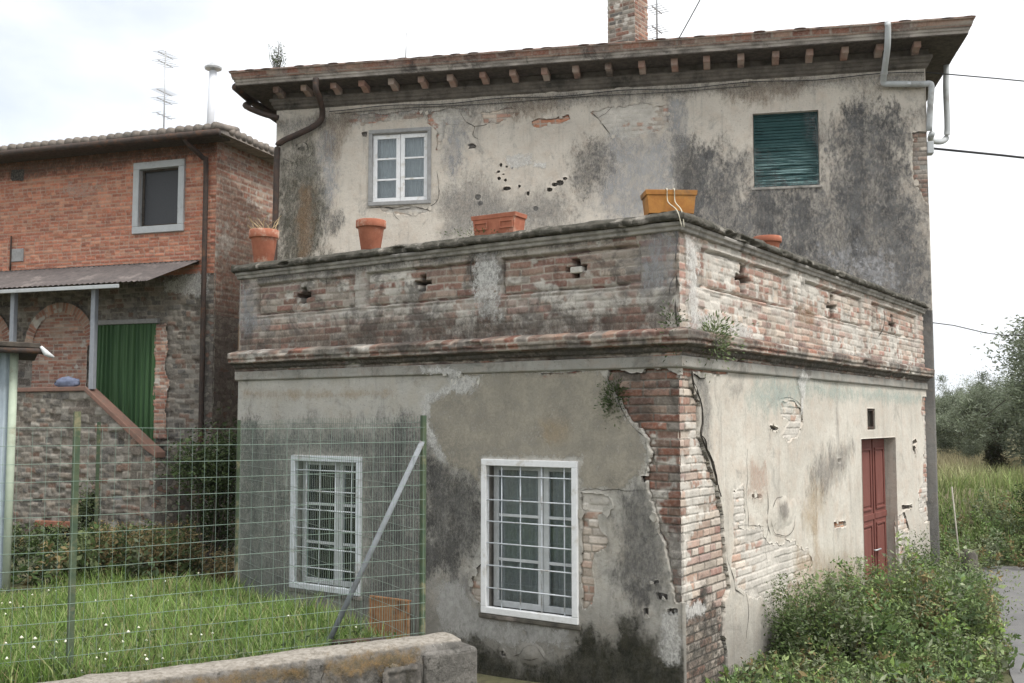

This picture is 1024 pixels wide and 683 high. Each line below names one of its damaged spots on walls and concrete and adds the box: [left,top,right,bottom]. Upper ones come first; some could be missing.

leakage [280,91,631,259]
flaking render [532,115,570,128]
leakage [573,73,932,320]
spalling [912,132,928,203]
leakage [213,167,663,654]
peeling [420,366,480,395]
flaking render [578,492,614,609]
flaking render [608,368,813,683]
crack [691,371,770,563]